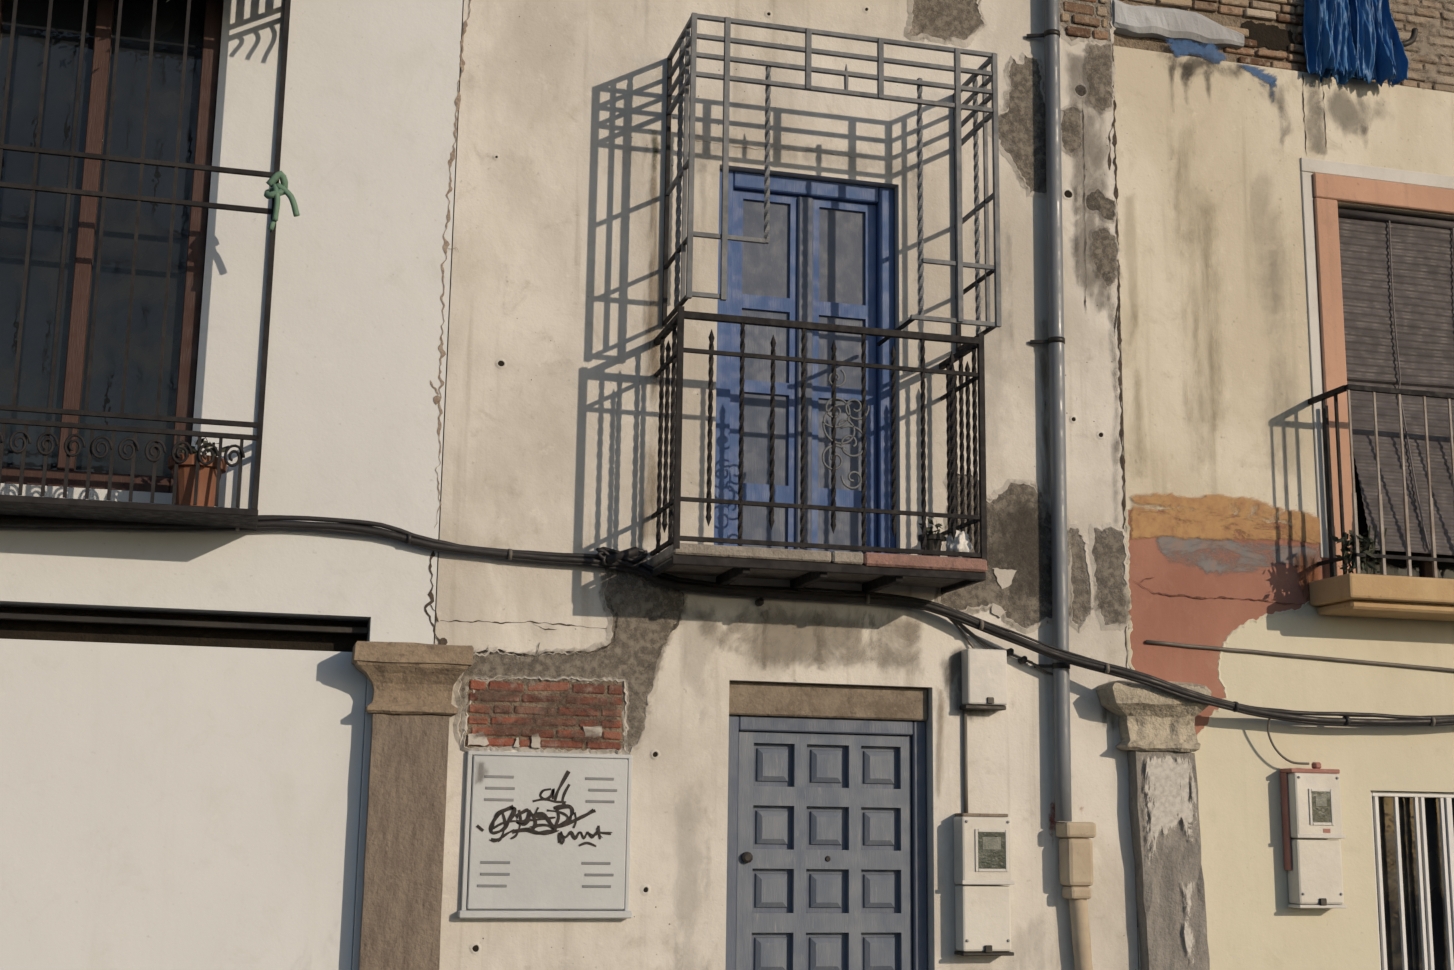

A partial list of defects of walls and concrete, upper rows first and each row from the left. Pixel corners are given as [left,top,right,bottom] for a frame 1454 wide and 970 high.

spalling [904,0,988,48]
spalling [988,0,1120,291]
leakage [1168,39,1277,102]
crack [424,0,618,657]
spalling [453,546,688,760]
crack [659,592,685,654]
peeling [934,468,1330,864]
peeling [1182,880,1194,963]